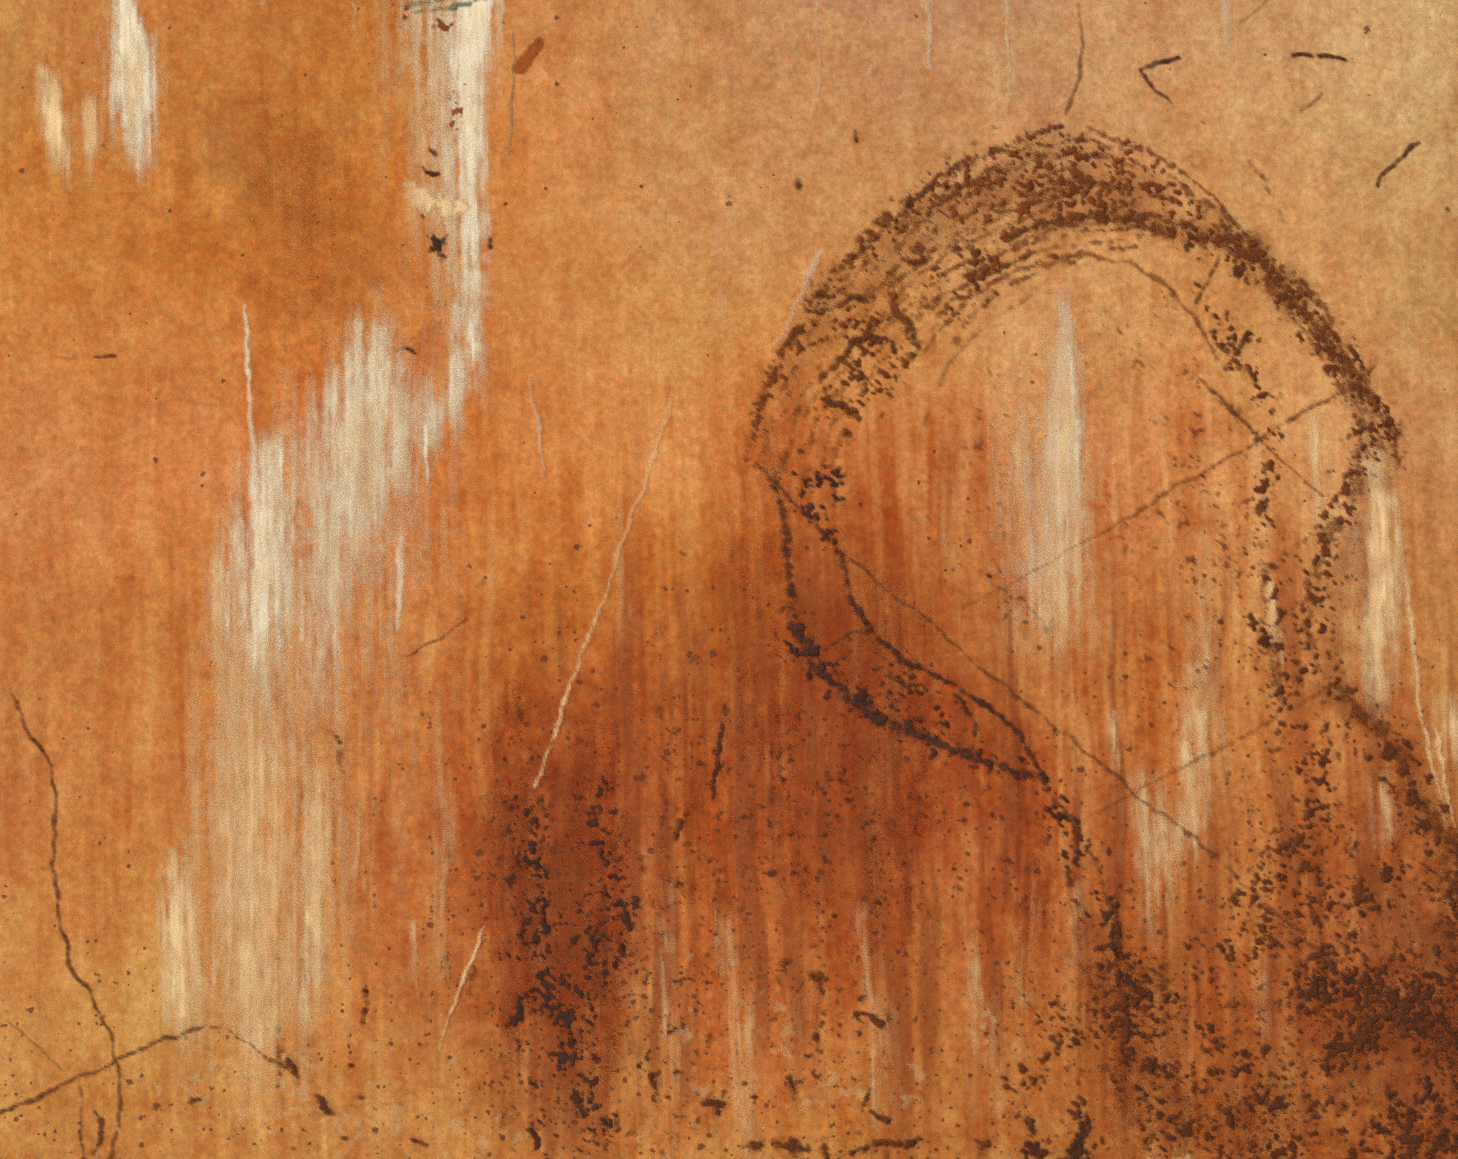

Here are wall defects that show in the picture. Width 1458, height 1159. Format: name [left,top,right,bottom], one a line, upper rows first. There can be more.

peeling [39,0,157,169]
peeling [162,0,493,1069]
corrosion [751,124,1458,1159]
crack [15,700,122,1159]
corrosion [503,775,639,1159]